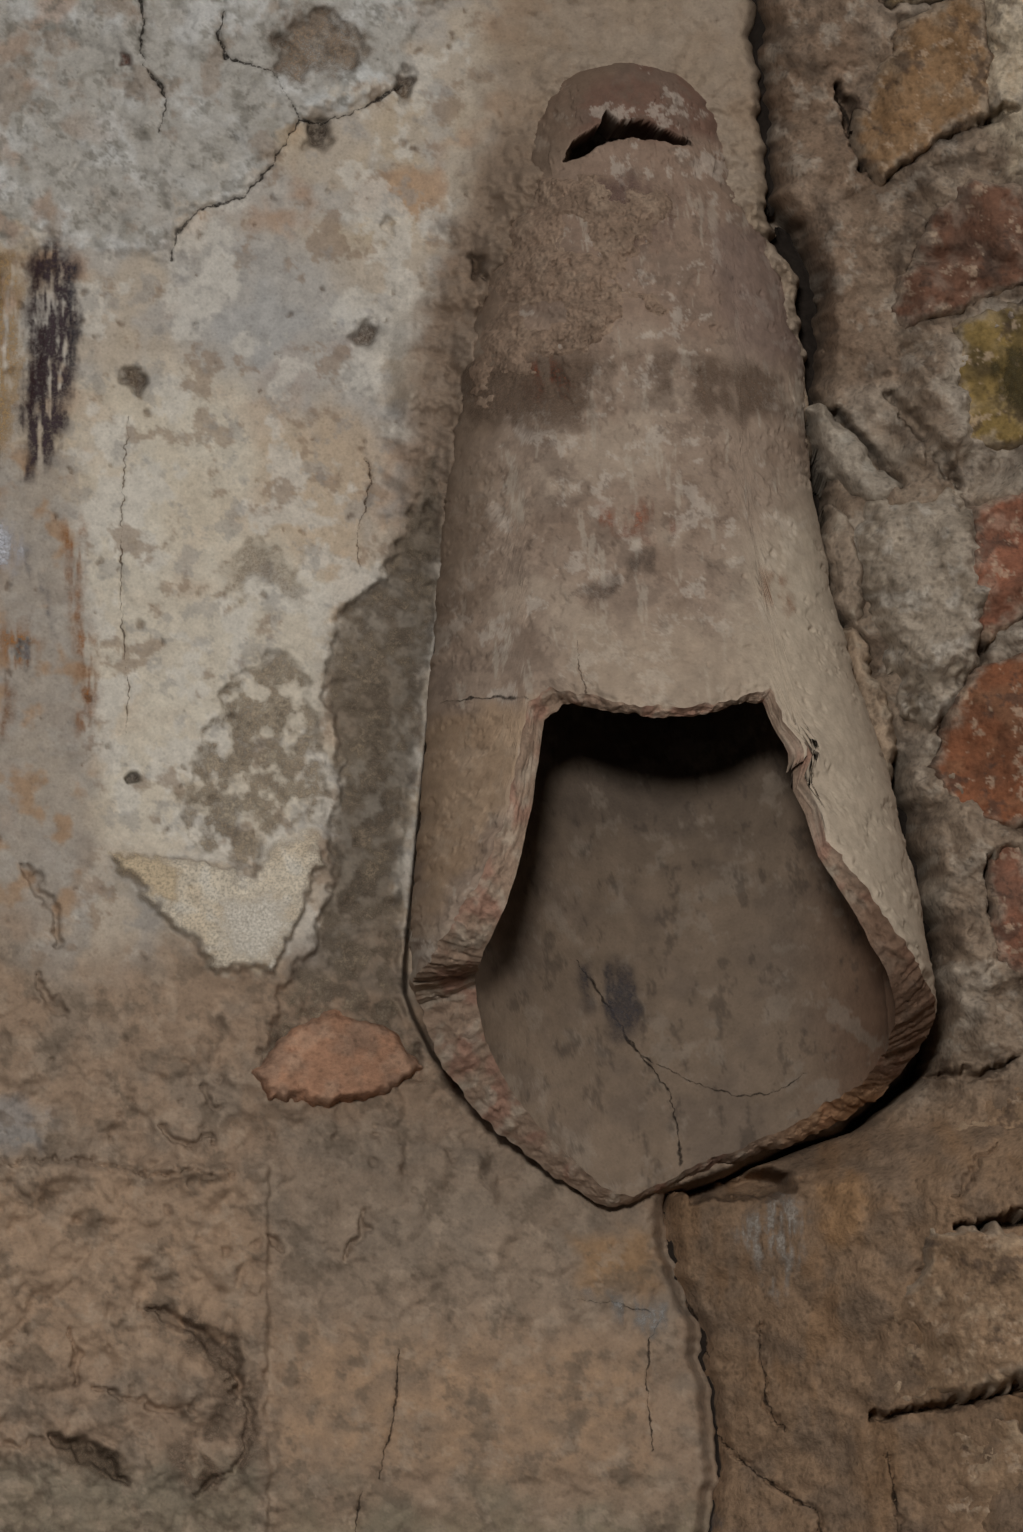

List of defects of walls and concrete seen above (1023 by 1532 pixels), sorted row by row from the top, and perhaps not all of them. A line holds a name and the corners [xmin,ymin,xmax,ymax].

crack [139,0,166,132]
crack [170,12,399,261]
crack [748,0,817,406]
water stain [0,243,80,477]
crack [810,466,820,517]
crack [891,783,918,884]
crack [923,920,932,959]
crack [972,1220,1023,1228]
spalling [53,1432,128,1486]
spalling [169,1309,262,1491]
crack [589,1212,822,1532]
crack [878,1385,1020,1511]